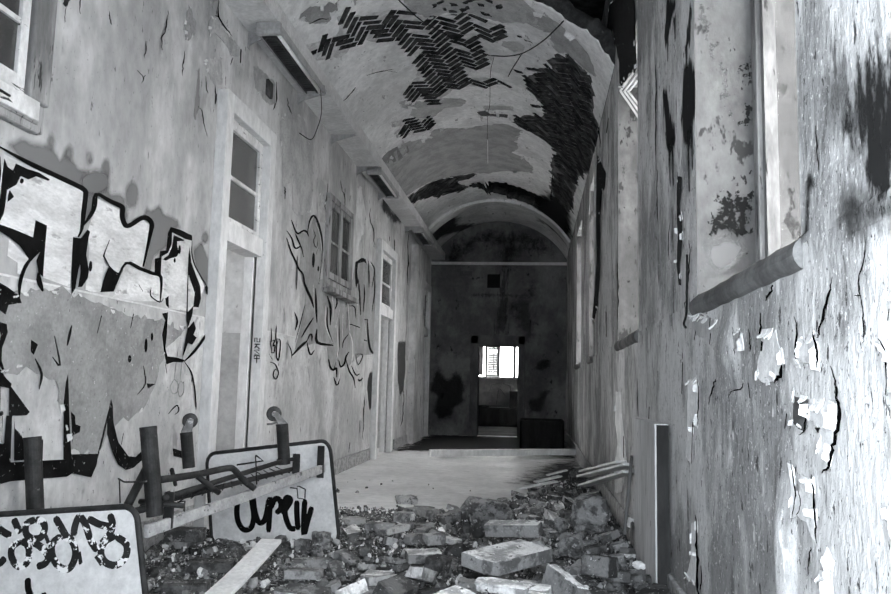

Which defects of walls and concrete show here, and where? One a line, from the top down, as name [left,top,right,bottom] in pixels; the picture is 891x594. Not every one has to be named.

spalling [299,0,606,322]
water stain [832,40,891,237]
peeling [0,286,187,454]
water stain [430,371,465,418]
peeling [685,376,699,463]
crack [681,362,750,464]
crack [732,285,773,354]
peeling [755,328,820,386]
crack [774,278,841,567]
peeling [787,387,837,543]
crack [854,235,890,395]
crack [694,515,702,594]